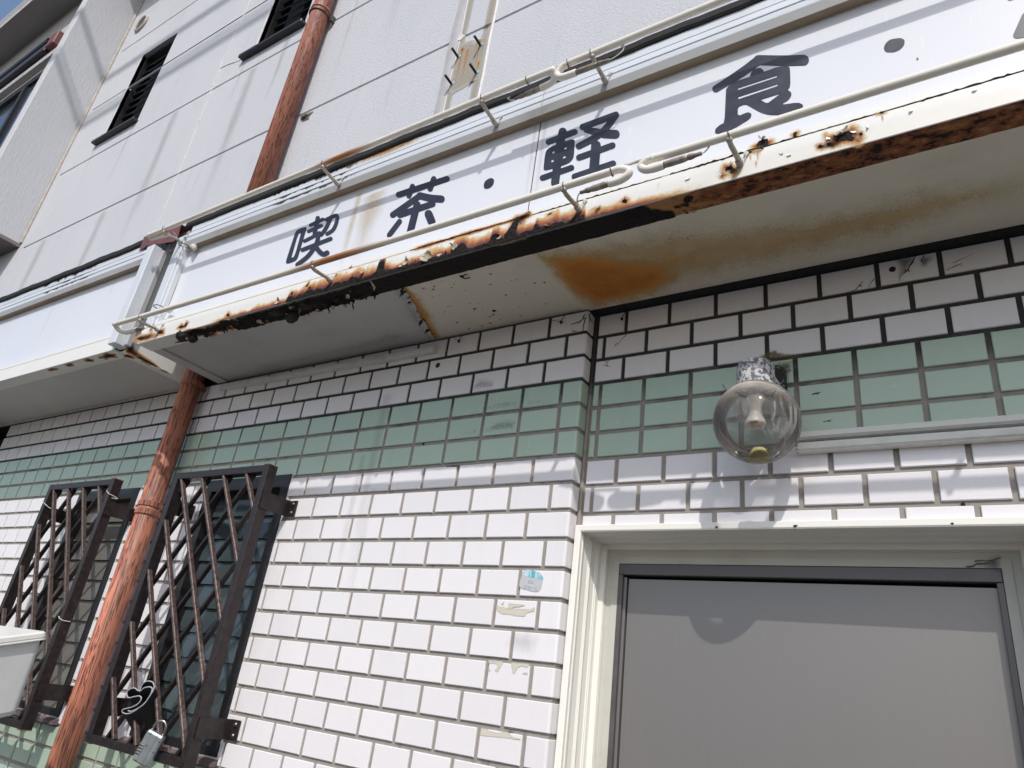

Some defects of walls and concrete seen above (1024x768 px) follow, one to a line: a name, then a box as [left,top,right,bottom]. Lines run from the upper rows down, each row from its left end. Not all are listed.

corrosion [48,100,1024,373]
crack [899,254,971,281]